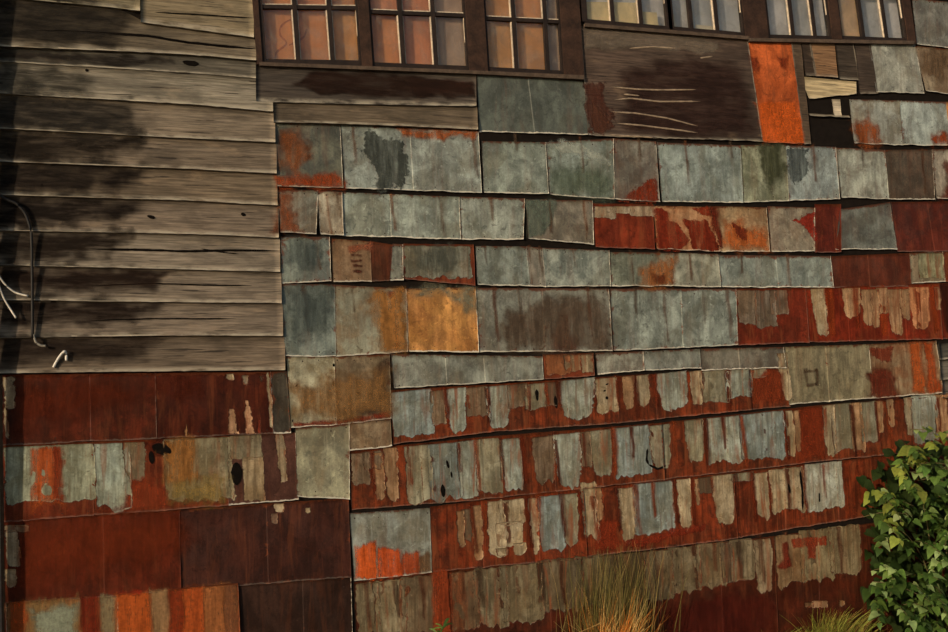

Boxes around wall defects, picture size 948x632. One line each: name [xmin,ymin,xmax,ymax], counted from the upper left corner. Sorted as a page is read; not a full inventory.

rust [760,103,802,142]
rust [854,117,881,155]
leakage [356,129,410,195]
rust [618,178,768,313]
rust [792,212,818,241]
peeling [736,290,789,330]
peeling [810,288,829,336]
peeling [842,253,945,336]
peeling [2,376,147,513]
peeling [350,352,948,632]
rust [7,582,238,632]